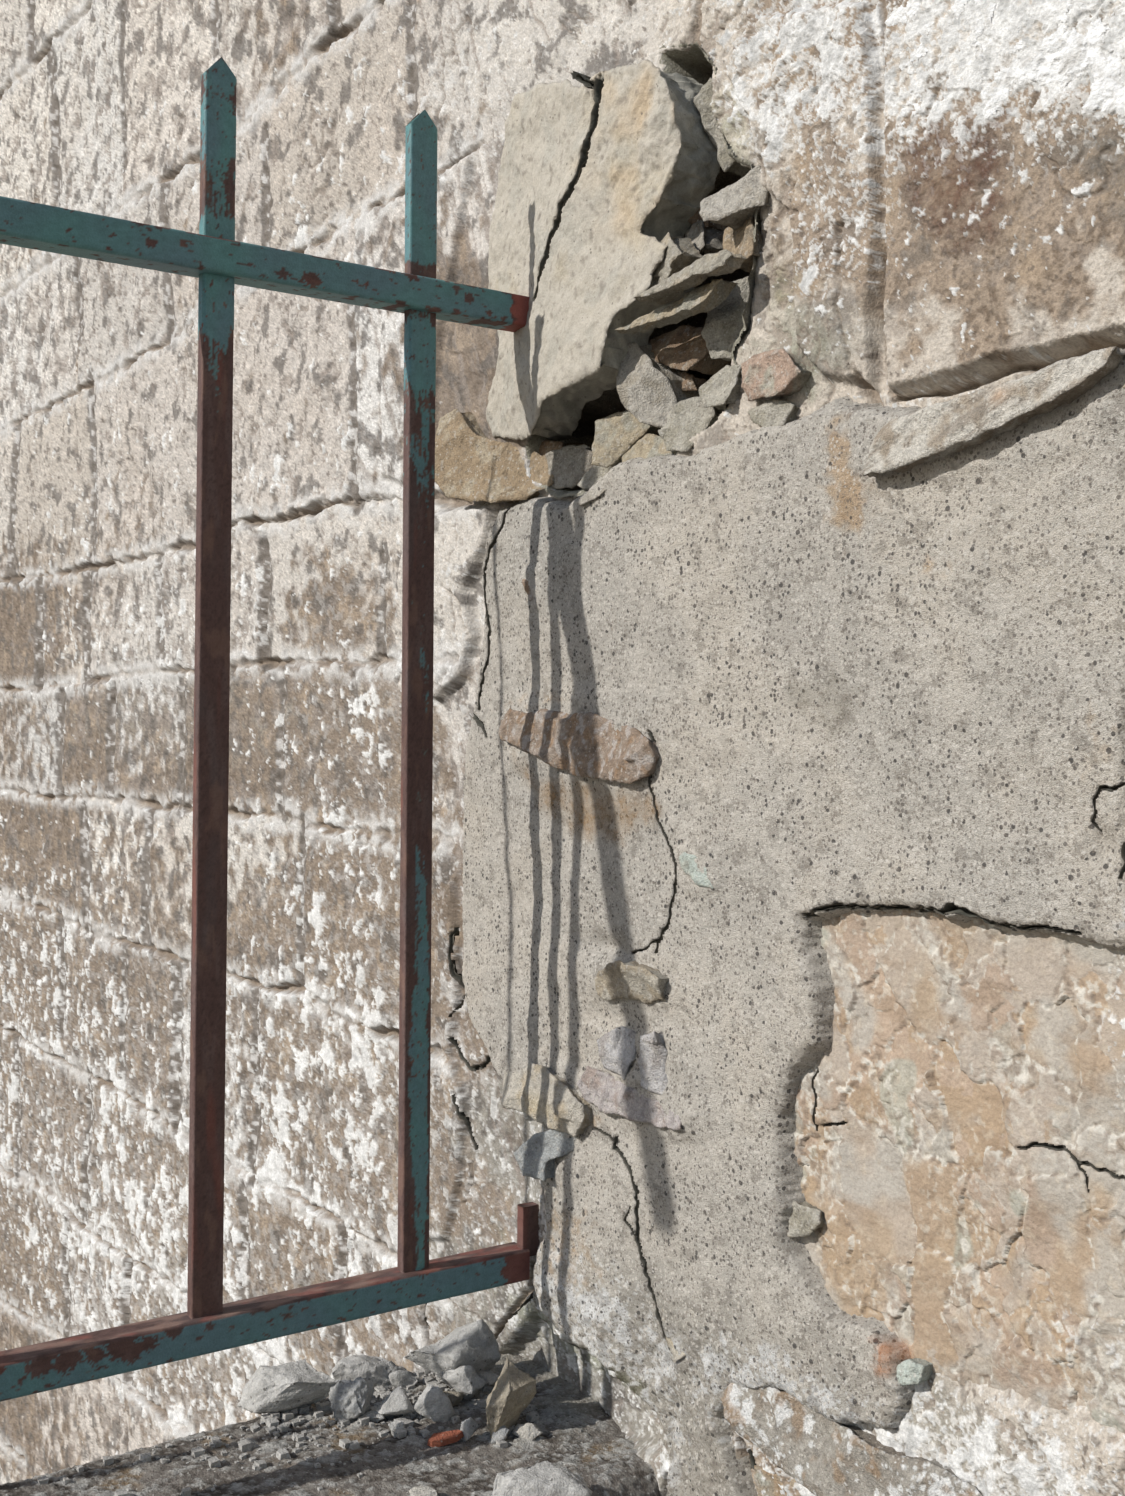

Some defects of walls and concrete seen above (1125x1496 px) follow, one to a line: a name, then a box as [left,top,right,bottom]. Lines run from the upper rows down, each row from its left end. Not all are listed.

spalling [659,41,716,85]
crack [534,70,604,299]
spalling [706,106,753,198]
spalling [649,312,707,340]
spalling [694,207,762,365]
spalling [525,387,626,459]
crack [473,507,512,737]
crack [632,731,677,954]
crack [803,903,1081,934]
crack [595,1128,666,1340]
spalling [792,908,1125,1434]
crack [1017,1143,1125,1193]